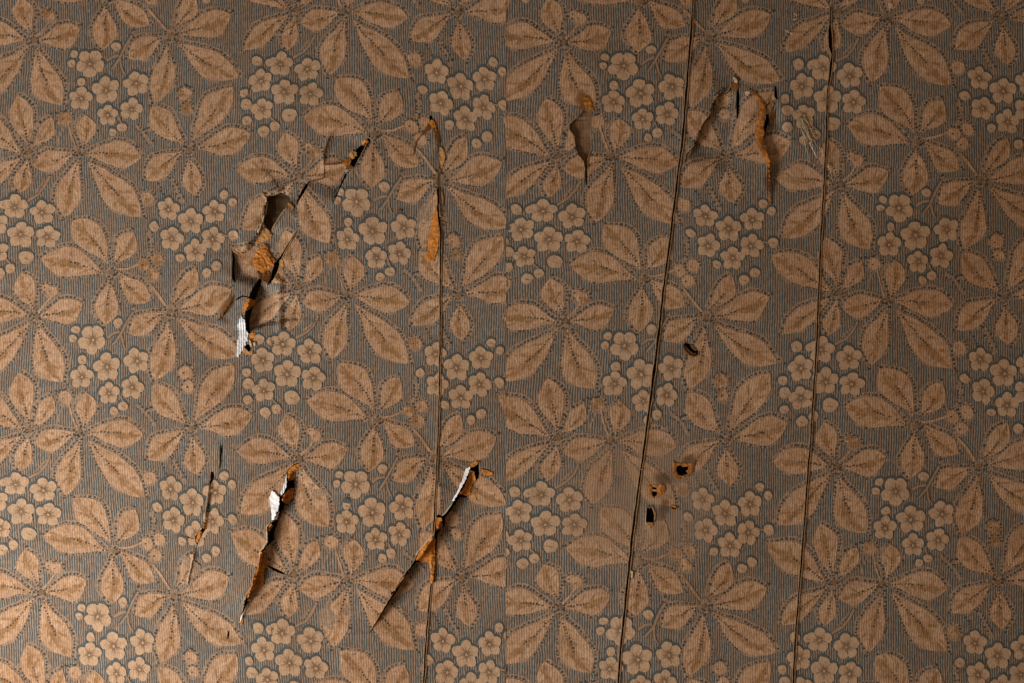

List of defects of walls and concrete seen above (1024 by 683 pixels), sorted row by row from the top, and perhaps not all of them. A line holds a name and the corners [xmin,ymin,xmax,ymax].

spalling [263,181,310,231]
spalling [334,132,370,201]
spalling [570,110,591,185]
spalling [685,83,740,163]
spalling [232,231,297,351]
crack [216,446,224,469]
spalling [240,462,301,624]
spalling [432,464,479,552]
spalling [645,460,696,528]
spalling [369,551,420,634]